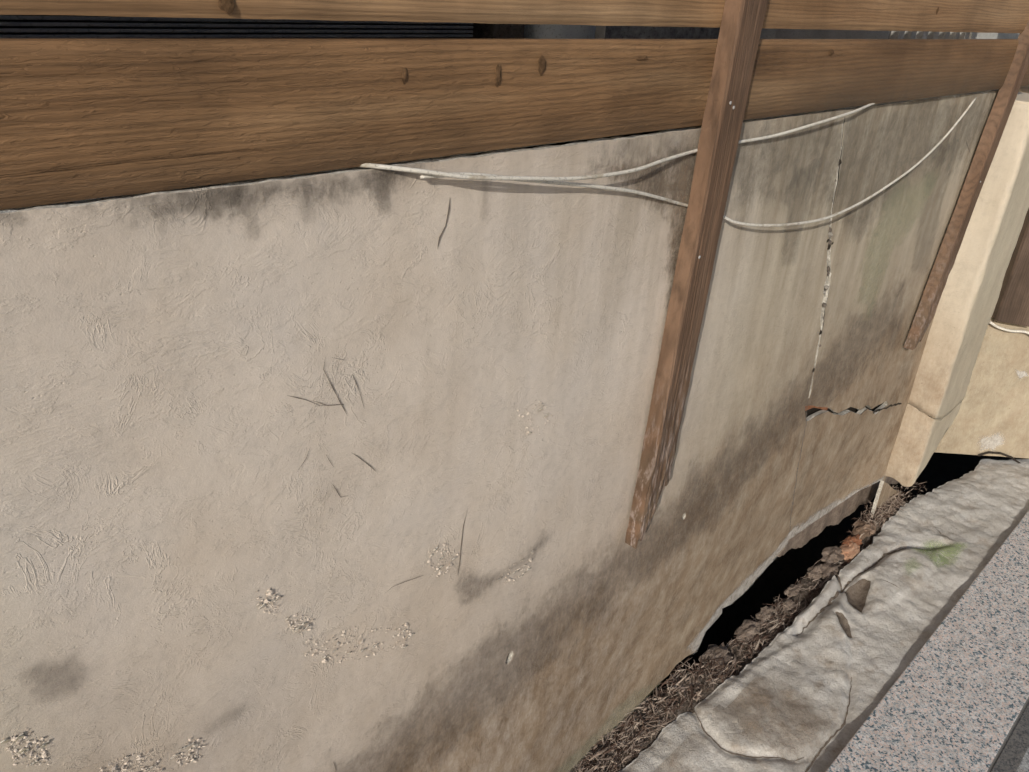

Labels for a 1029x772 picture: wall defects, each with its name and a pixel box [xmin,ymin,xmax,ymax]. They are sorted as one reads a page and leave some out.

crack [812,227,834,372]
spalling [889,452,983,503]
spalling [645,496,876,698]
water stain [692,491,858,651]
peeling [0,727,53,767]
peeling [99,737,205,772]
crack [694,677,852,772]